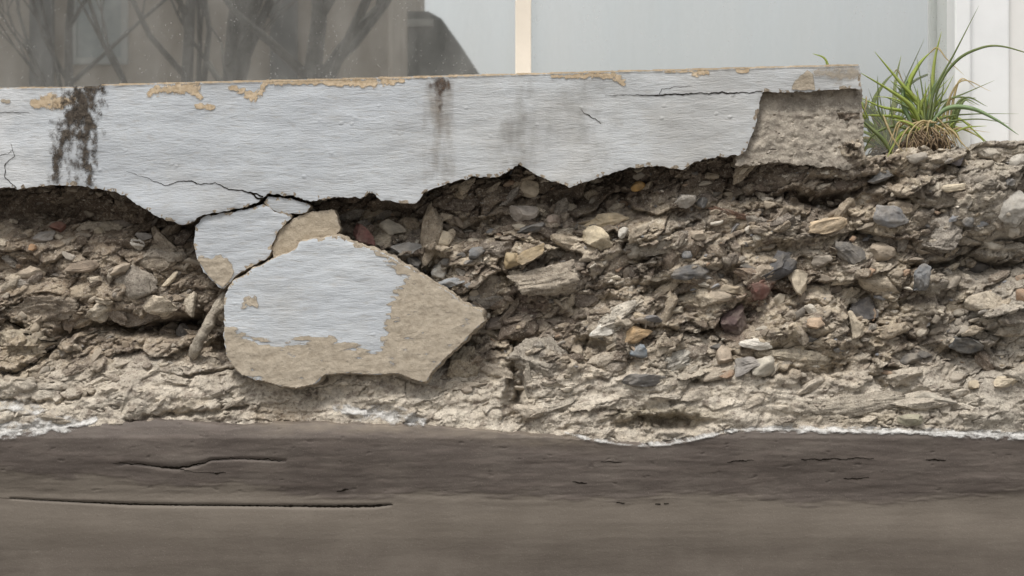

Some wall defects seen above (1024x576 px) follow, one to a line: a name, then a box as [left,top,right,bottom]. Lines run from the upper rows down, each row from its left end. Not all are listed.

peeling [0,87,83,110]
leakage [50,86,95,183]
peeling [102,64,859,110]
spalling [837,113,860,121]
crack [129,172,263,200]
spalling [0,139,1024,443]